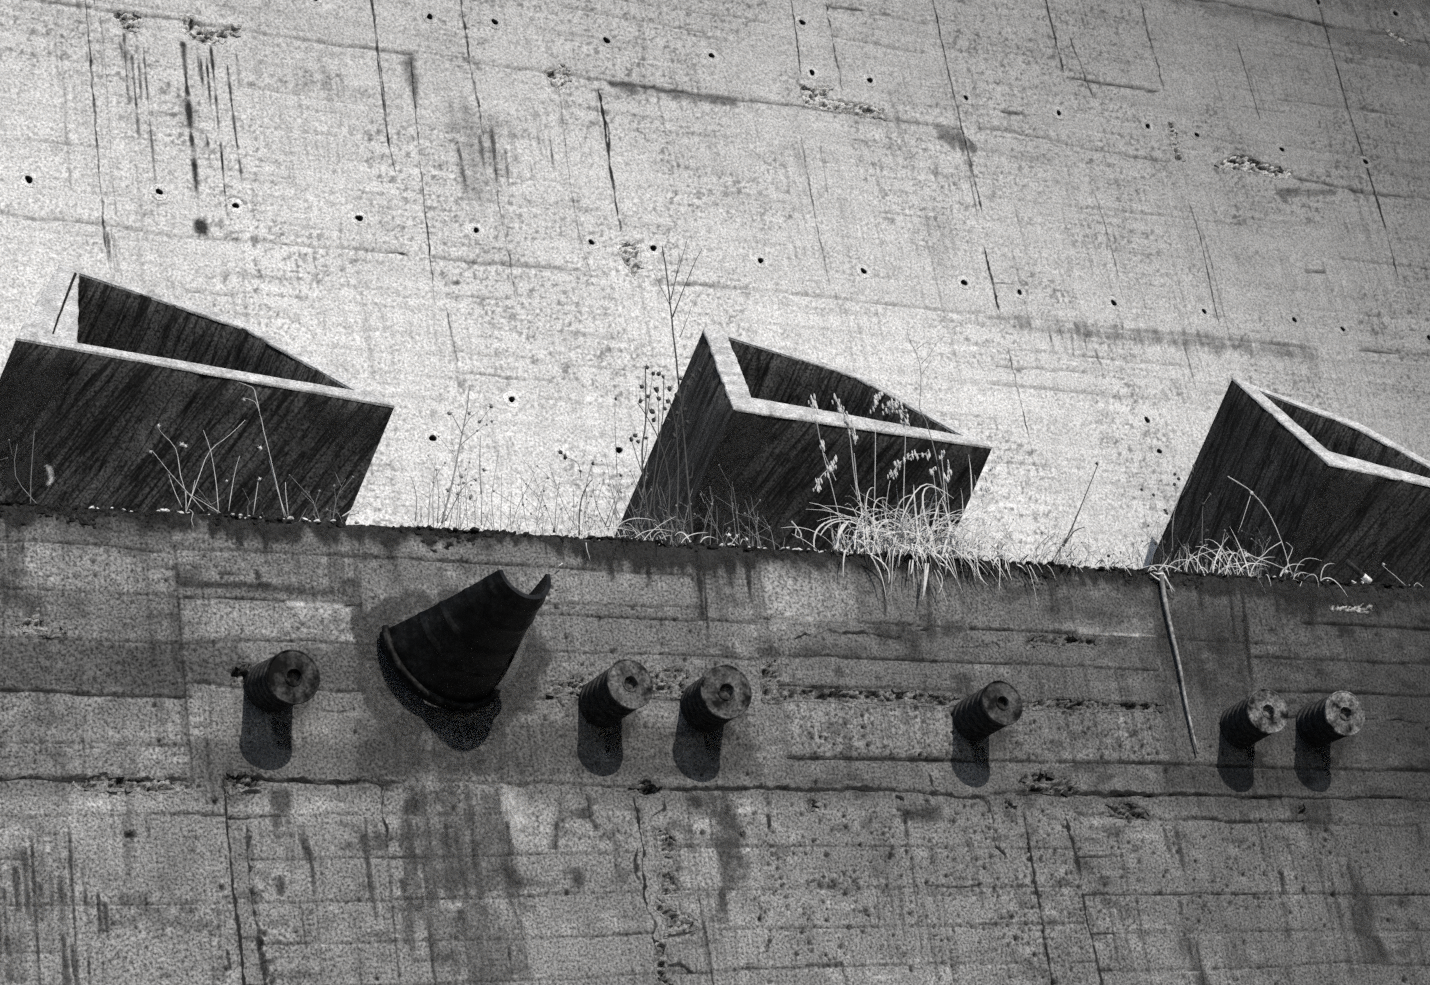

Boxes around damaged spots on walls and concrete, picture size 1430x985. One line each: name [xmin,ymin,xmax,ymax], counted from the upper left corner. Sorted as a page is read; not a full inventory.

spalling [178,15,244,45]
water stain [119,33,154,160]
water stain [180,41,241,194]
spalling [799,84,887,120]
spalling [1214,152,1296,179]
water stain [195,219,208,234]
water stain [352,589,551,773]
water stain [581,797,598,829]
water stain [301,835,315,884]
water stain [361,834,372,892]
water stain [399,790,521,940]